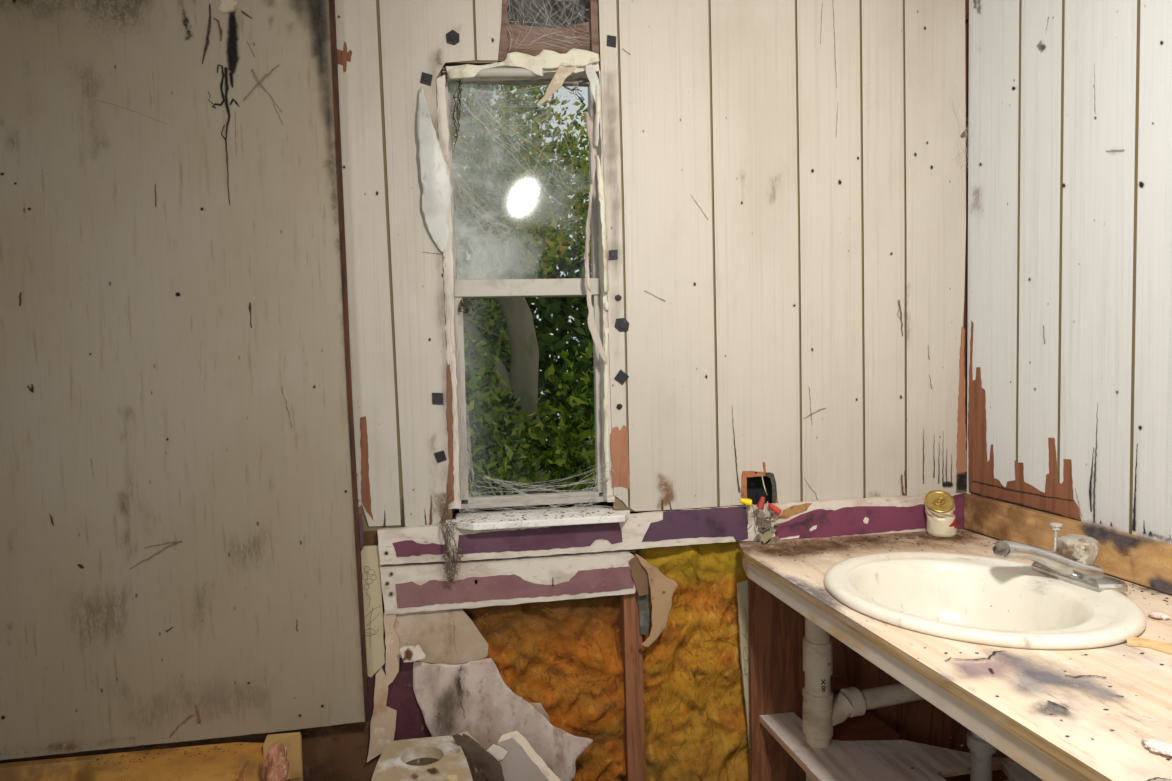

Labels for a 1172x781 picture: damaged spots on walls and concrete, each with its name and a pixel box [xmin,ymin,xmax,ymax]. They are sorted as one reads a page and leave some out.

damp [297,0,331,126]
peeling [393,522,623,557]
peeling [642,506,748,542]
peeling [774,496,927,540]
peeling [952,473,967,530]
peeling [395,566,634,608]
damp [1145,578,1172,594]